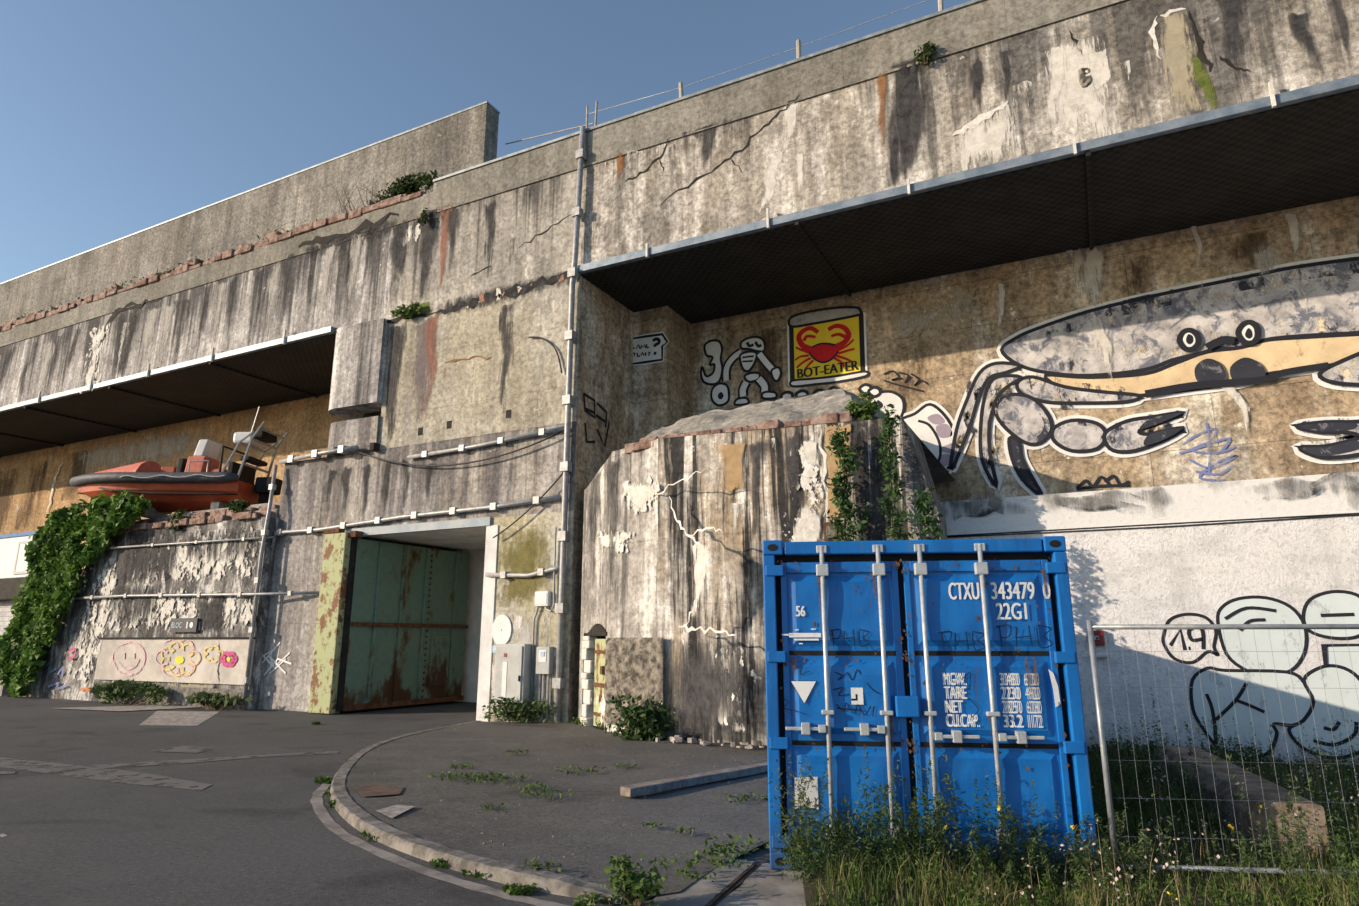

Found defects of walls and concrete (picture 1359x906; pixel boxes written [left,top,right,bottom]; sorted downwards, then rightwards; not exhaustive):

crack [625,95,799,197]
rust [877,75,887,144]
leakage [887,60,925,185]
peeling [1148,8,1213,115]
leakage [1275,0,1321,68]
leakage [386,201,469,297]
rust [440,205,452,284]
rust [426,315,490,380]
leakage [499,304,514,402]
leakage [669,432,823,620]
peeling [67,525,262,682]
leakage [669,639,743,737]